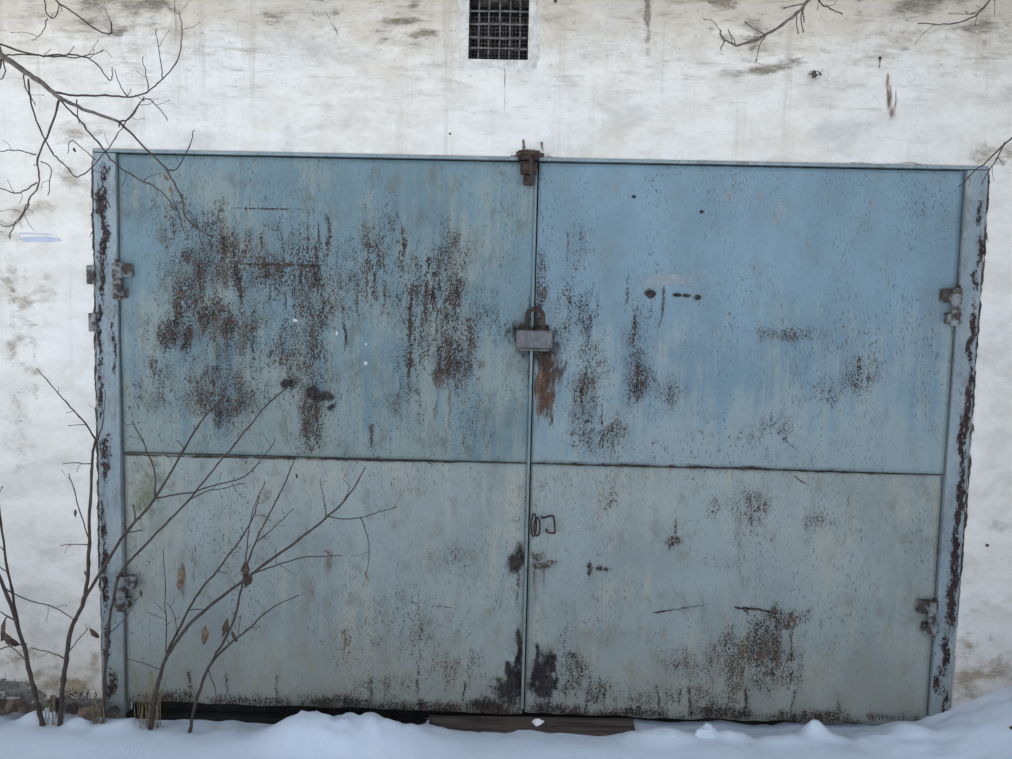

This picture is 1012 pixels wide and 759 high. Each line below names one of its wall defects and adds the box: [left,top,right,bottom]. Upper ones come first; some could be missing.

damp [121,0,167,9]
damp [384,1,435,38]
damp [749,58,799,75]
peeling [123,187,505,457]
rust [505,219,590,425]
rust [428,331,466,390]
peeling [0,164,118,717]
rust [128,591,920,724]
damp [959,668,1002,690]